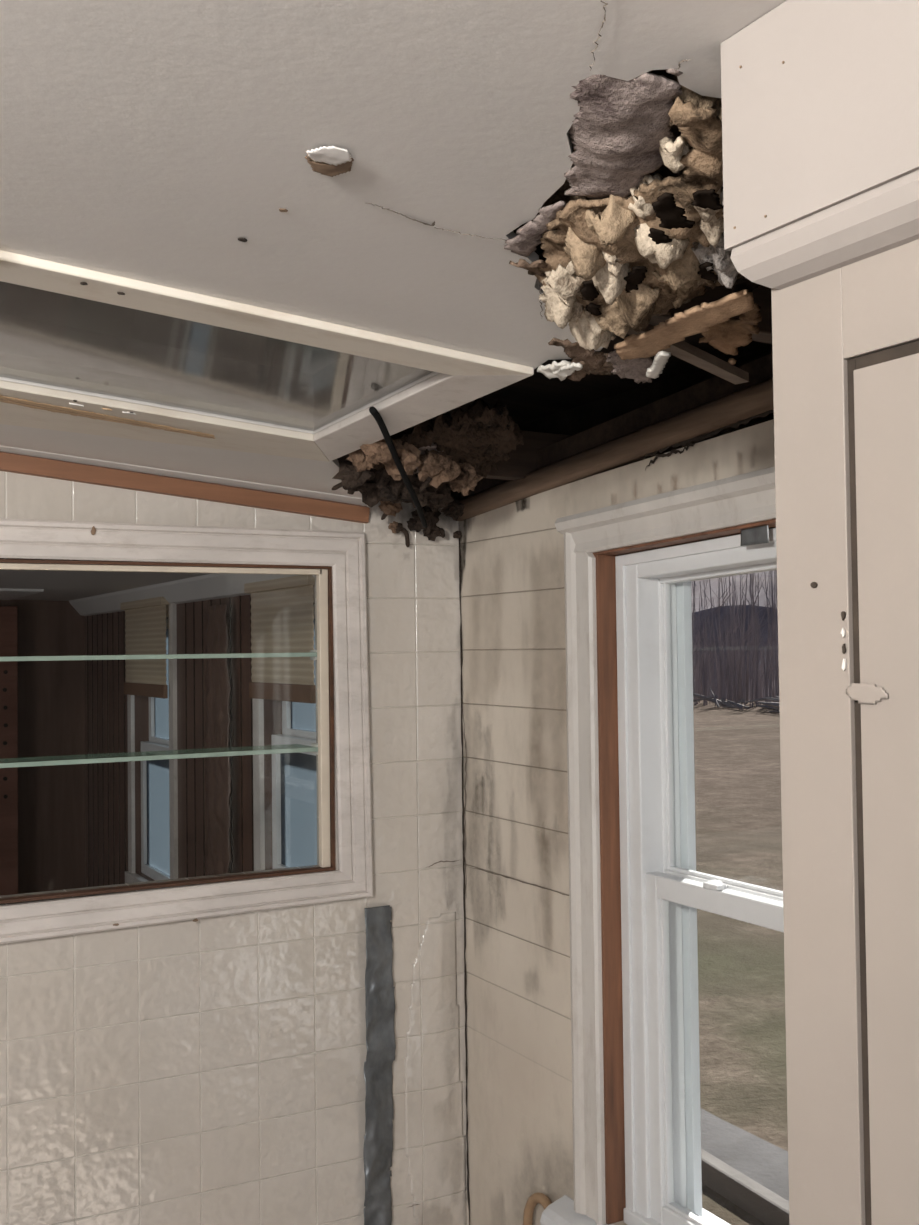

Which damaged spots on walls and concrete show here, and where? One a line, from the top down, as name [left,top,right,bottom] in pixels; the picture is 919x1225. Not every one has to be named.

crack [589,1,608,71]
crack [365,203,505,240]
spalling [537,350,616,381]